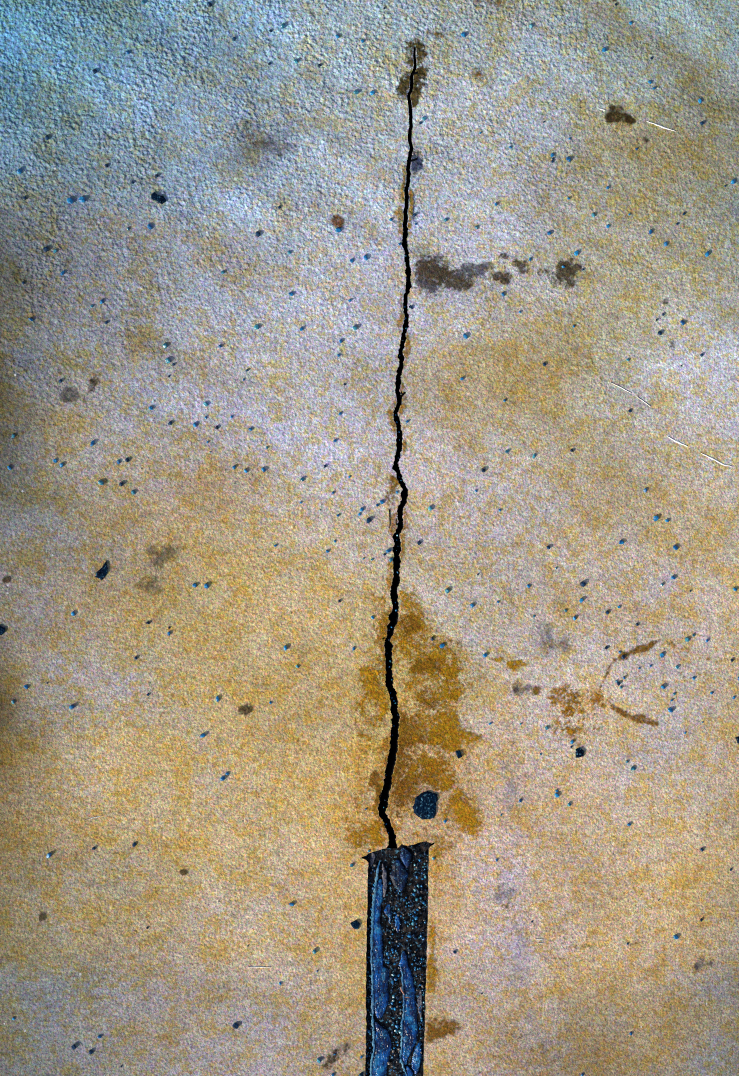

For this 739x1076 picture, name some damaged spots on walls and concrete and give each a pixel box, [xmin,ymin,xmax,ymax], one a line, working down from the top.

crack [378,46,418,848]
leakage [418,253,582,296]